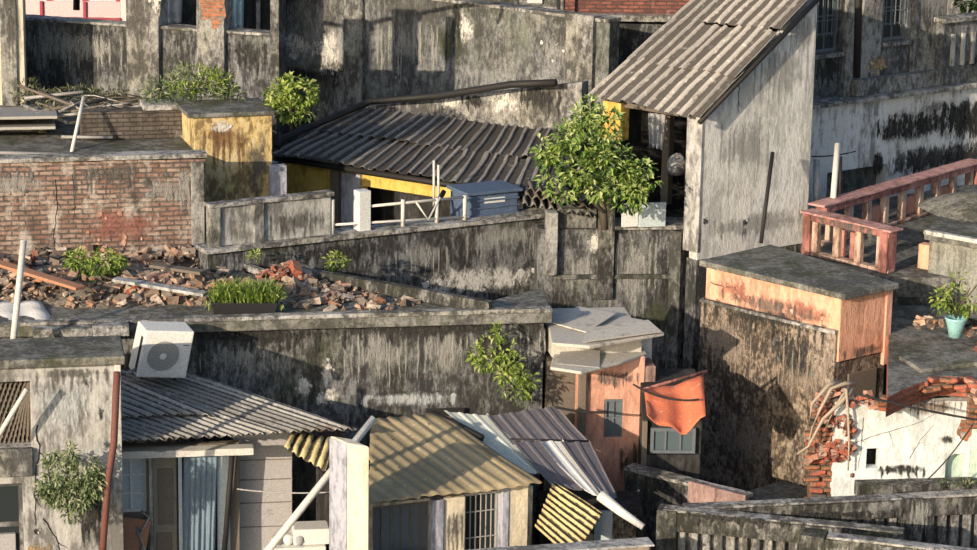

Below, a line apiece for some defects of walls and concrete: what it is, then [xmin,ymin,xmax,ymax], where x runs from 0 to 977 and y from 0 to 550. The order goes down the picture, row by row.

spalling [200,0,226,29]
damp [369,0,460,75]
mould [873,98,977,174]
damp [198,329,327,370]
damp [342,324,506,406]
damp [704,289,826,403]
spalling [940,420,972,443]
crack [33,425,68,550]